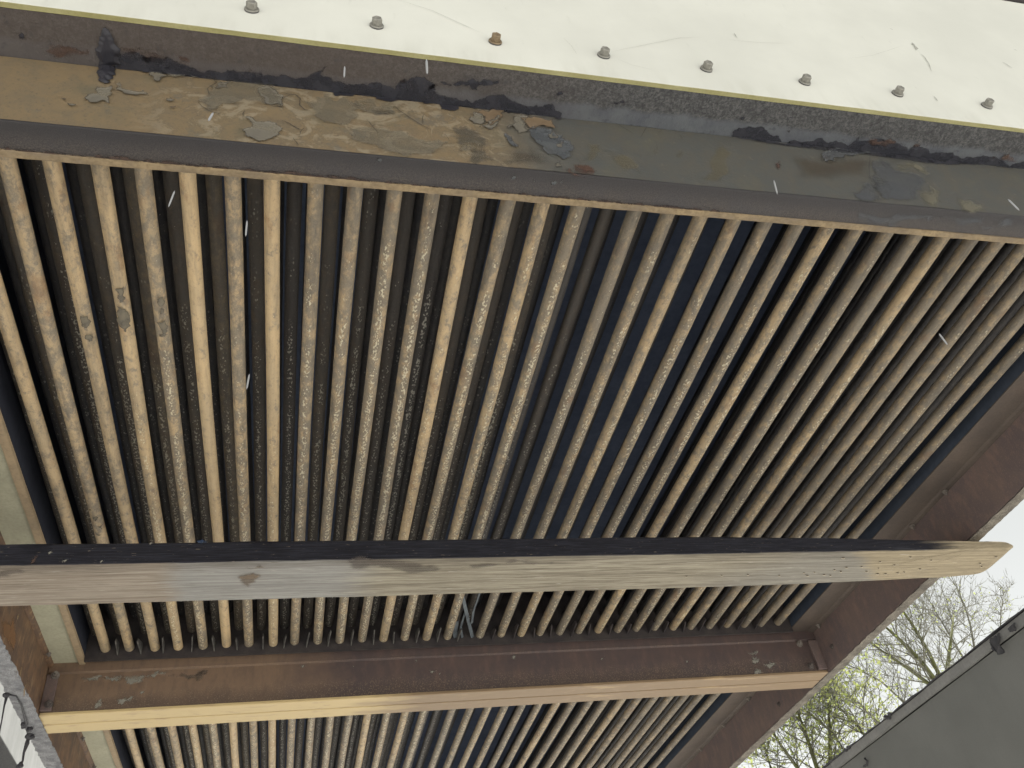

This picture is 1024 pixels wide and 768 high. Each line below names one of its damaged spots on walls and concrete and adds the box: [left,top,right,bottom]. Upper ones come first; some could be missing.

peeling [469,109,555,147]